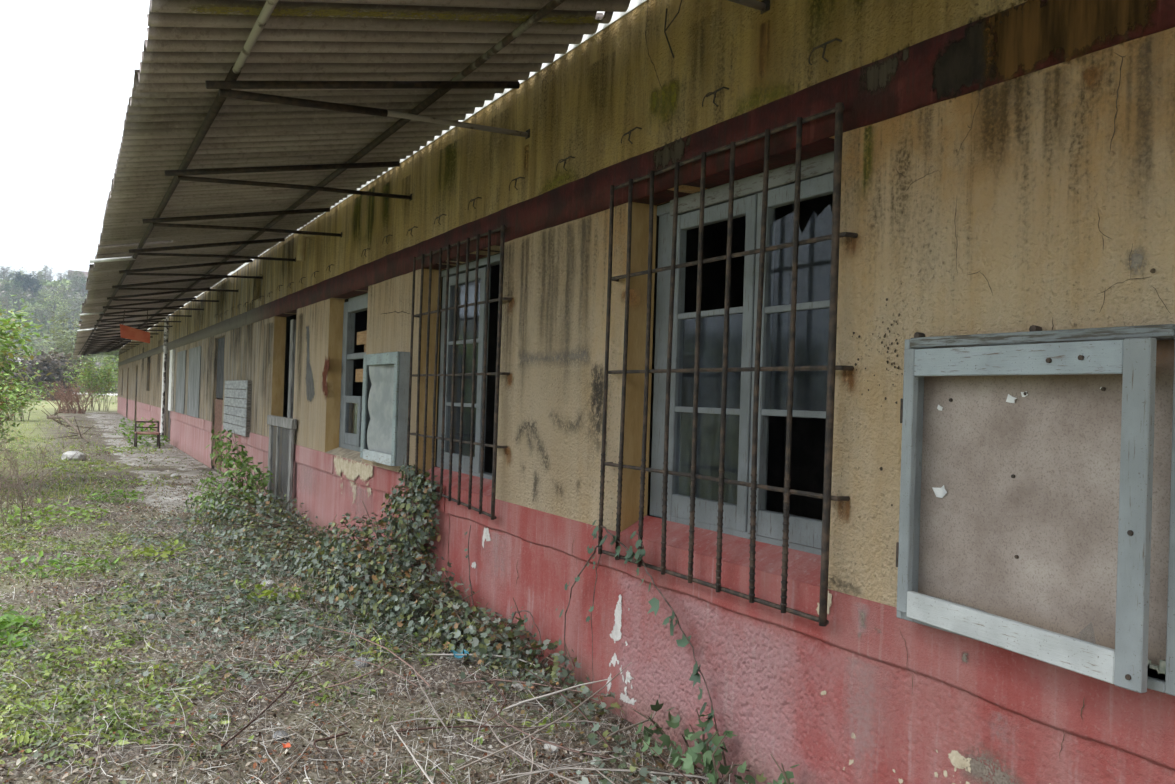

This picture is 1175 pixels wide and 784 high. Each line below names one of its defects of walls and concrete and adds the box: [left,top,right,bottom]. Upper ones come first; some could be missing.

peeling [931,0,1157,100]
crack [1098,214,1171,314]
leakage [520,350,602,426]
spalling [333,454,373,503]
peeling [606,594,636,705]
spalling [934,750,971,784]